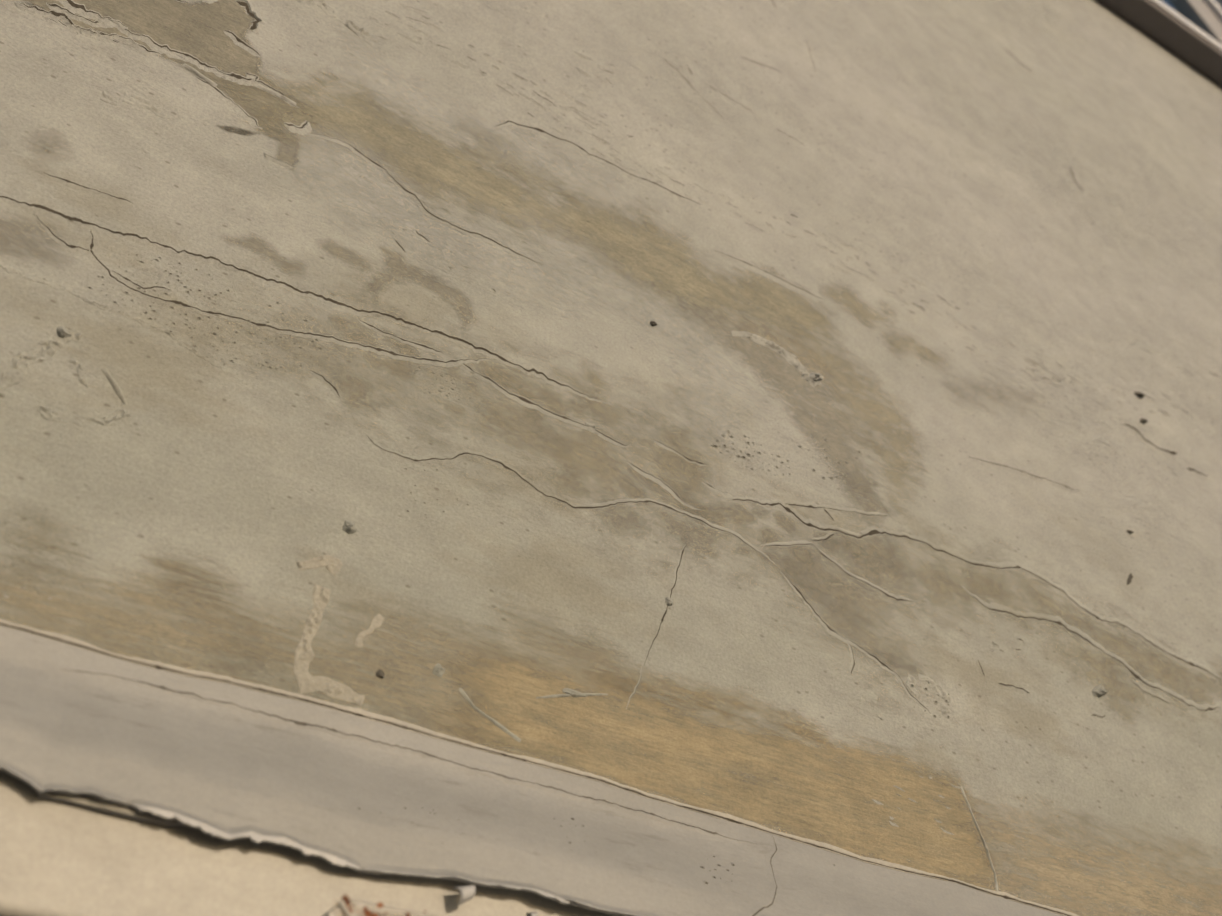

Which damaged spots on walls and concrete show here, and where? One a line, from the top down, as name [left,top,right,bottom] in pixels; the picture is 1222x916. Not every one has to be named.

peeling [14,0,317,169]
leakage [258,79,912,512]
crack [0,172,1222,714]
leakage [0,578,1222,916]
crack [1090,710,1106,719]
peeling [0,759,662,916]
rust [341,895,387,916]